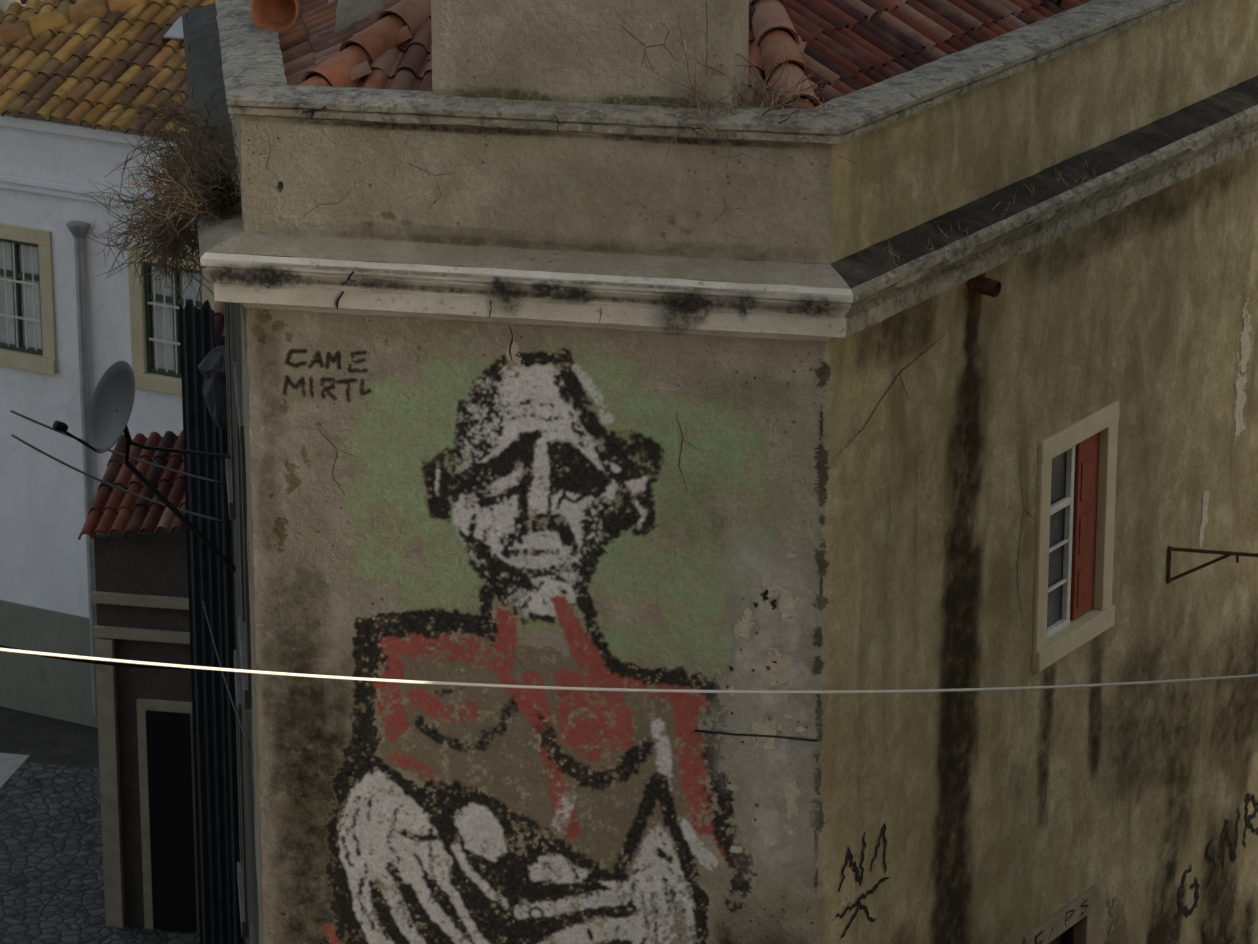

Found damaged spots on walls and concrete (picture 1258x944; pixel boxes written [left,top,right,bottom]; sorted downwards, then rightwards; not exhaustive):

water stain [216,266,308,288]
water stain [325,267,838,334]
flaking render [814,359,831,388]
crack [318,429,358,495]
crack [676,414,703,492]
flaking render [814,406,829,525]
peeling [734,540,830,651]
flaking render [811,627,825,675]
water stain [935,292,983,944]
peeling [741,694,825,892]